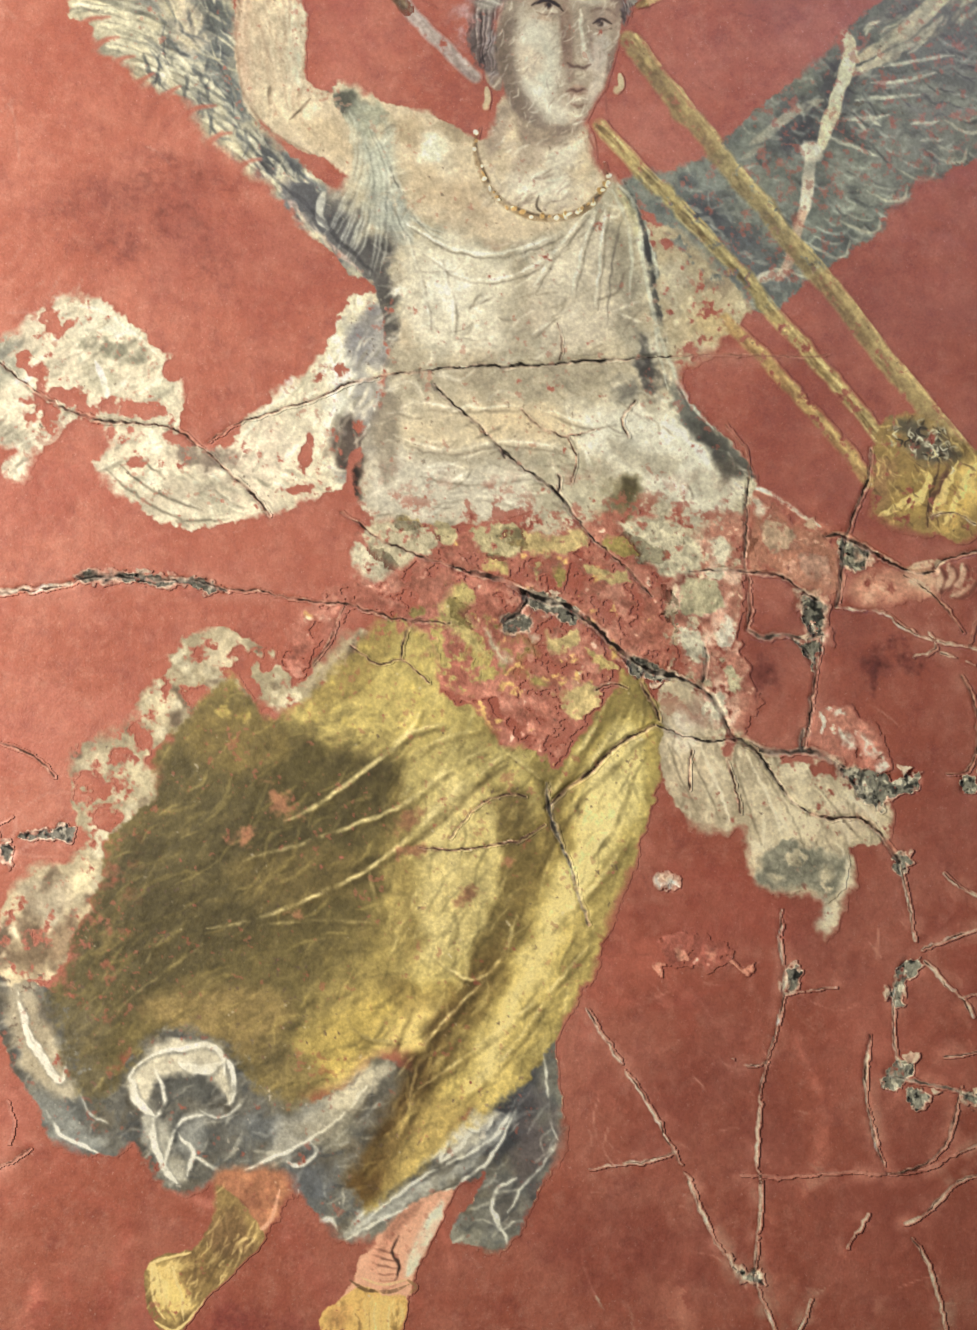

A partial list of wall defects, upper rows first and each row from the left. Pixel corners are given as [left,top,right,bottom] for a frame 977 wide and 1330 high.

crack [0,321,831,599]
crack [0,572,452,685]
peeling [278,495,877,768]
crack [0,741,57,779]
peeling [803,703,923,815]
spalling [0,821,77,871]
crack [339,422,977,1330]
crack [0,1099,33,1168]
spalling [879,1050,942,1112]
spalling [960,1087,977,1111]